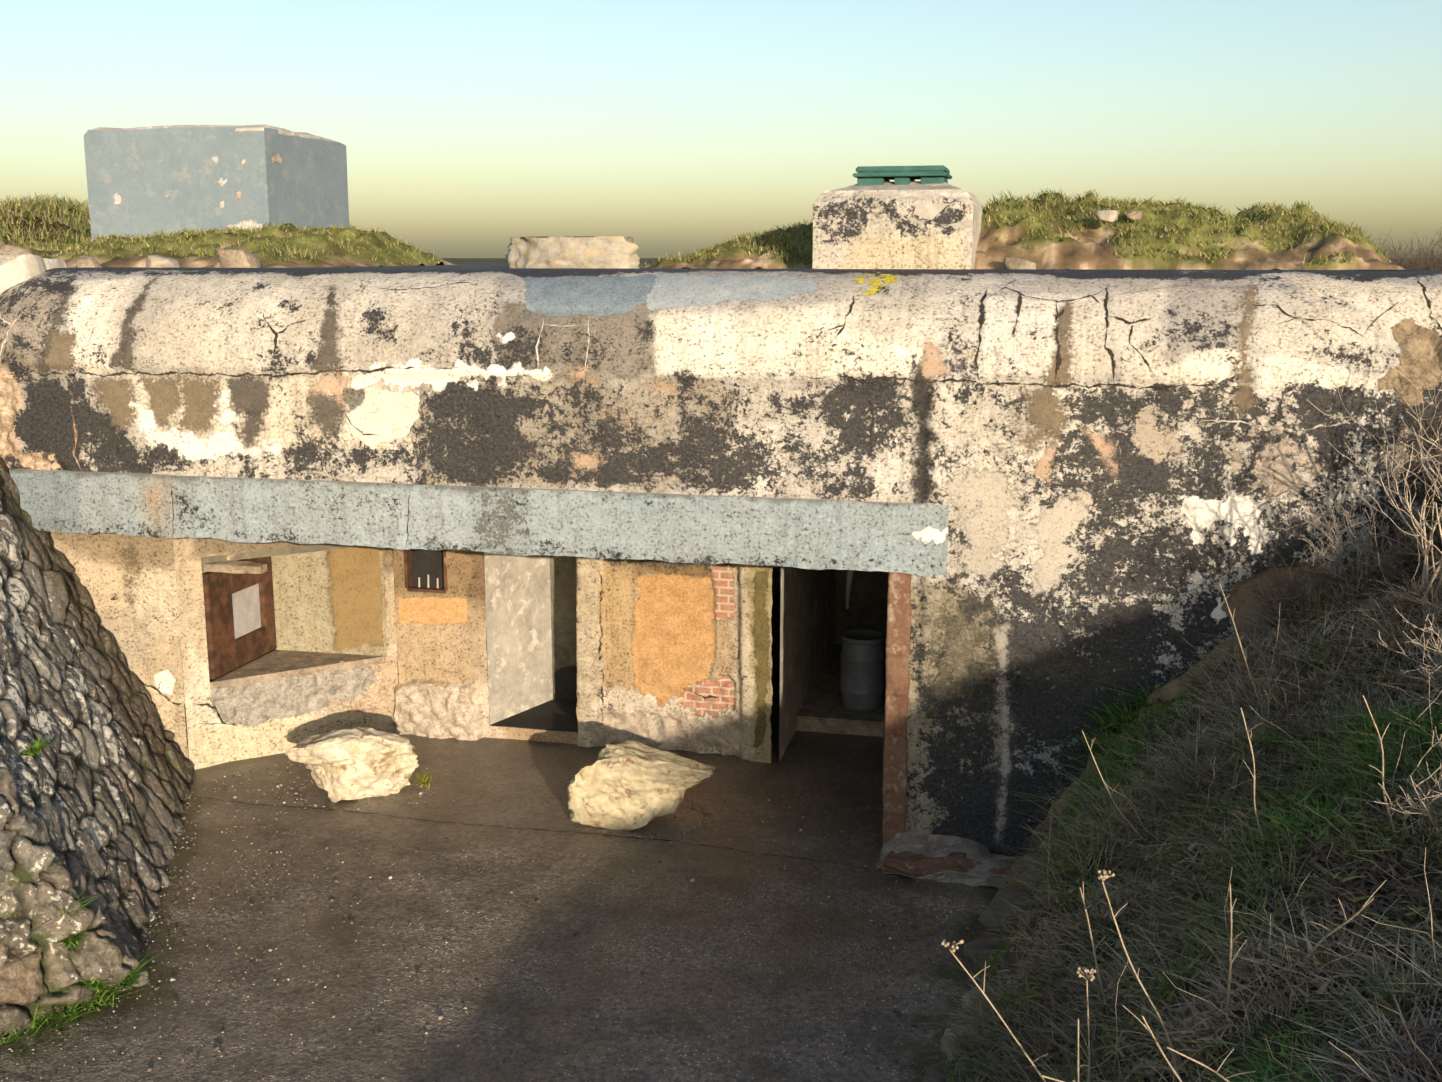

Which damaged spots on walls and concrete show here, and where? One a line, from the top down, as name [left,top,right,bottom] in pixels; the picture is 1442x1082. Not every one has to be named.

crack [0,313,480,472]
damp [908,360,939,504]
damp [1013,302,1075,454]
crack [805,279,1364,452]
peeling [1180,426,1324,555]
crack [1253,278,1442,337]
spalling [1378,318,1442,406]
peeling [585,564,757,762]
damp [913,590,1016,844]
spalling [1210,558,1336,639]